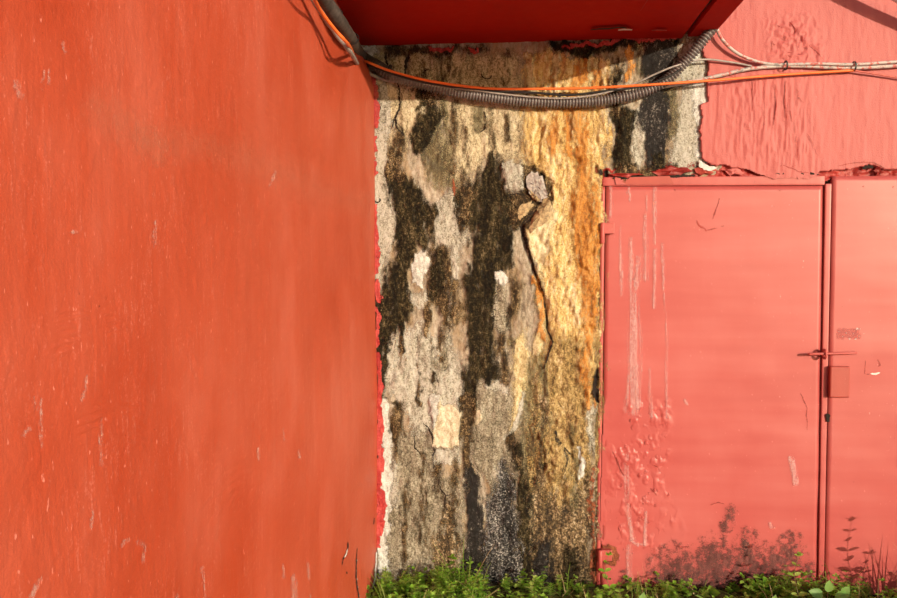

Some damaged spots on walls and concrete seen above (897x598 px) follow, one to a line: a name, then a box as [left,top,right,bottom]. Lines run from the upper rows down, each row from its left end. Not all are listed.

crack [510,172,554,369]
leakage [361,34,708,584]
corrosion [531,274,546,342]
corrosion [547,58,604,410]
flaking render [801,164,897,181]
leakage [627,503,815,589]